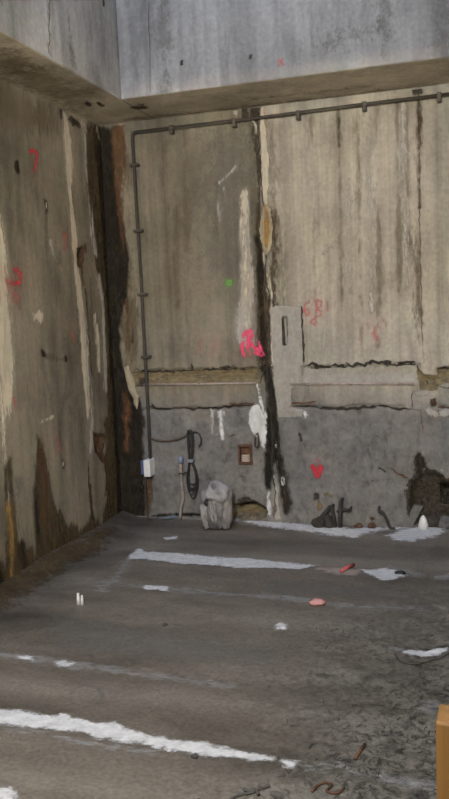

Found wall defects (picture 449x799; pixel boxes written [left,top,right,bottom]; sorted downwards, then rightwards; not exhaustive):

crack [256,107,264,225]
water stain [236,108,293,520]
spalling [124,364,260,409]
crack [144,254,305,517]
crack [291,393,449,432]
rust [3,458,19,577]
rust [33,438,67,560]
spalling [378,452,449,525]